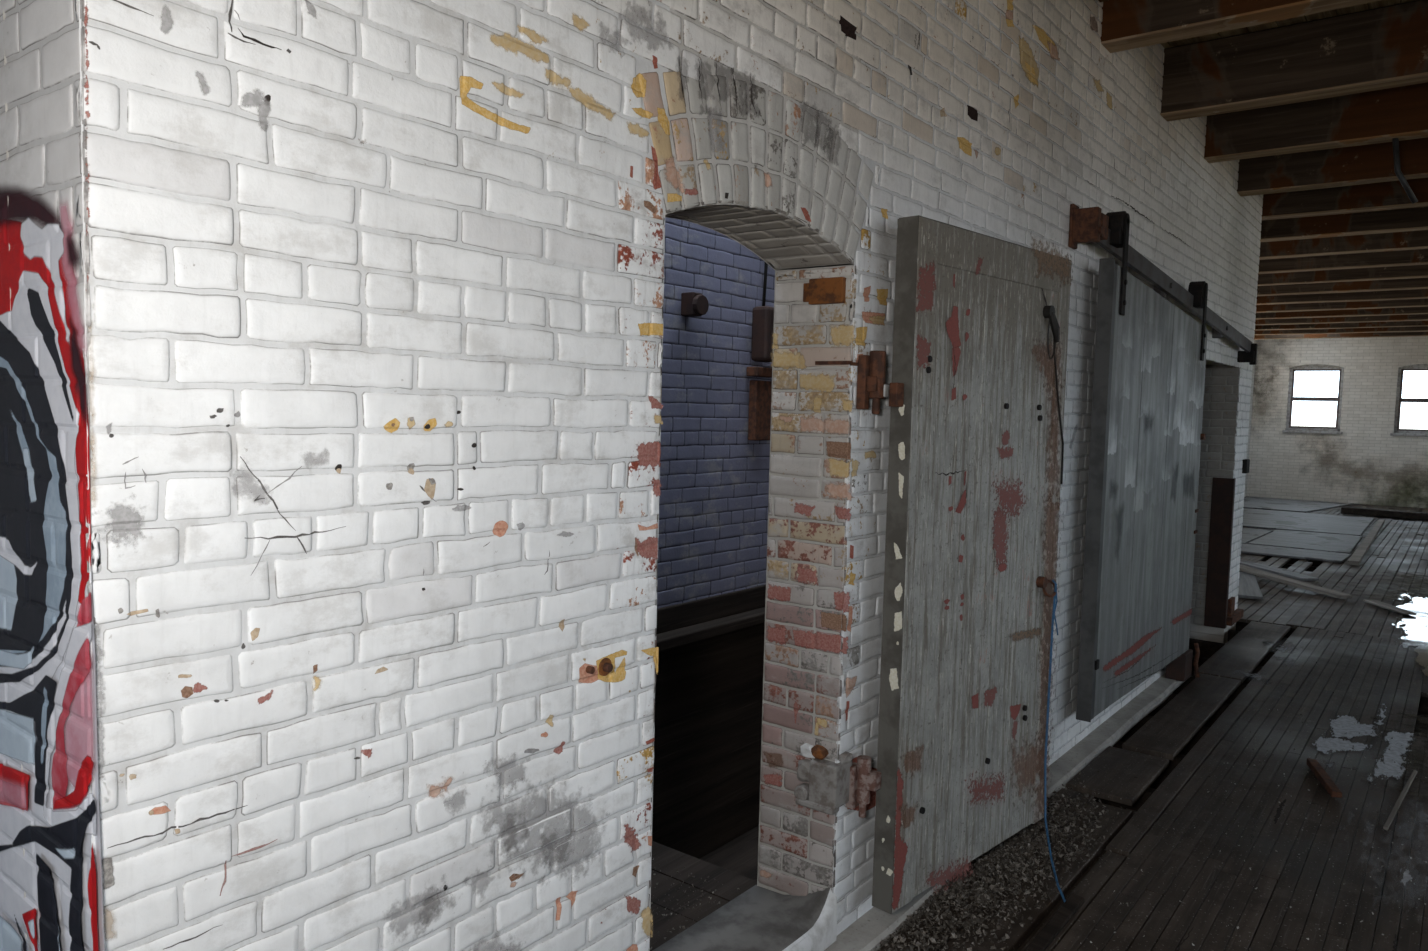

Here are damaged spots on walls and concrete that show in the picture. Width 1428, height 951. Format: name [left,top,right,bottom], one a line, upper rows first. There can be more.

peeling [573,15,589,31]
peeling [491,26,614,120]
peeling [459,76,530,134]
peeling [628,55,698,213]
peeling [638,323,663,336]
peeling [648,396,663,424]
peeling [637,441,661,497]
crack [240,456,346,575]
peeling [635,523,658,559]
spalling [579,647,659,683]
peeling [624,824,652,877]